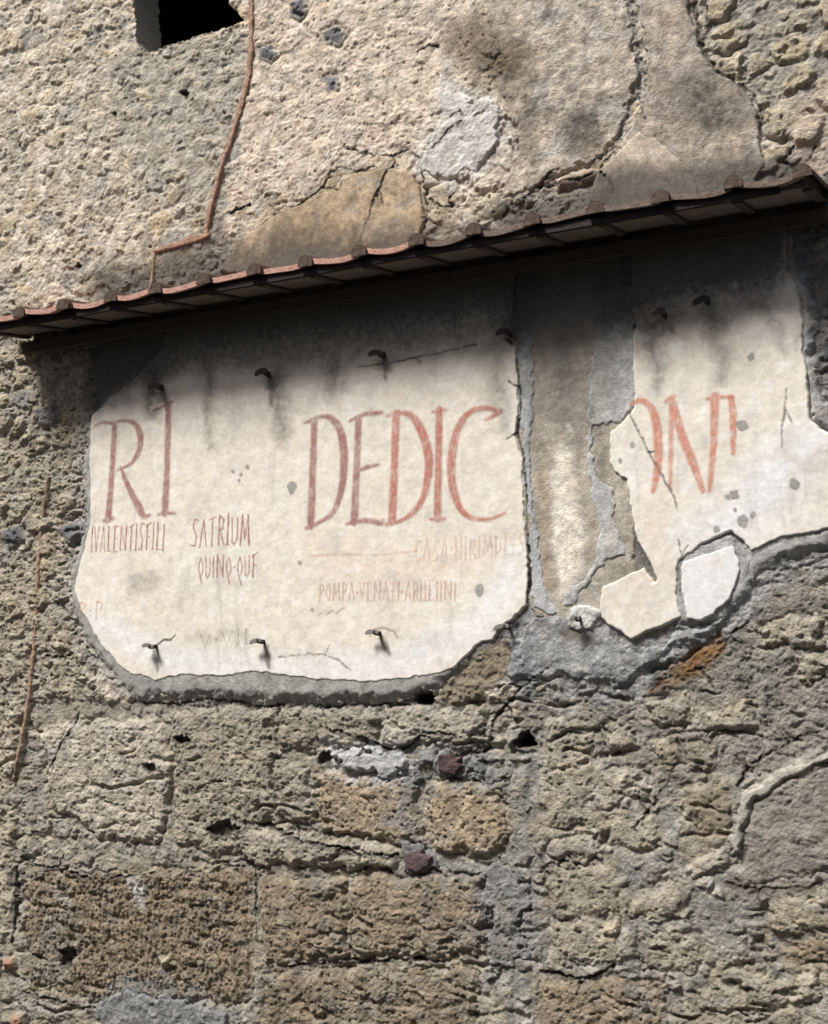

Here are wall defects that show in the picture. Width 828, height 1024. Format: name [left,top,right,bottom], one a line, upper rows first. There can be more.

crack [226,110,485,242]
crack [501,0,647,221]
damp [490,156,804,229]
crack [691,0,771,134]
damp [91,206,810,415]
crack [630,413,677,507]
peeling [632,526,740,640]
rust [652,635,723,691]